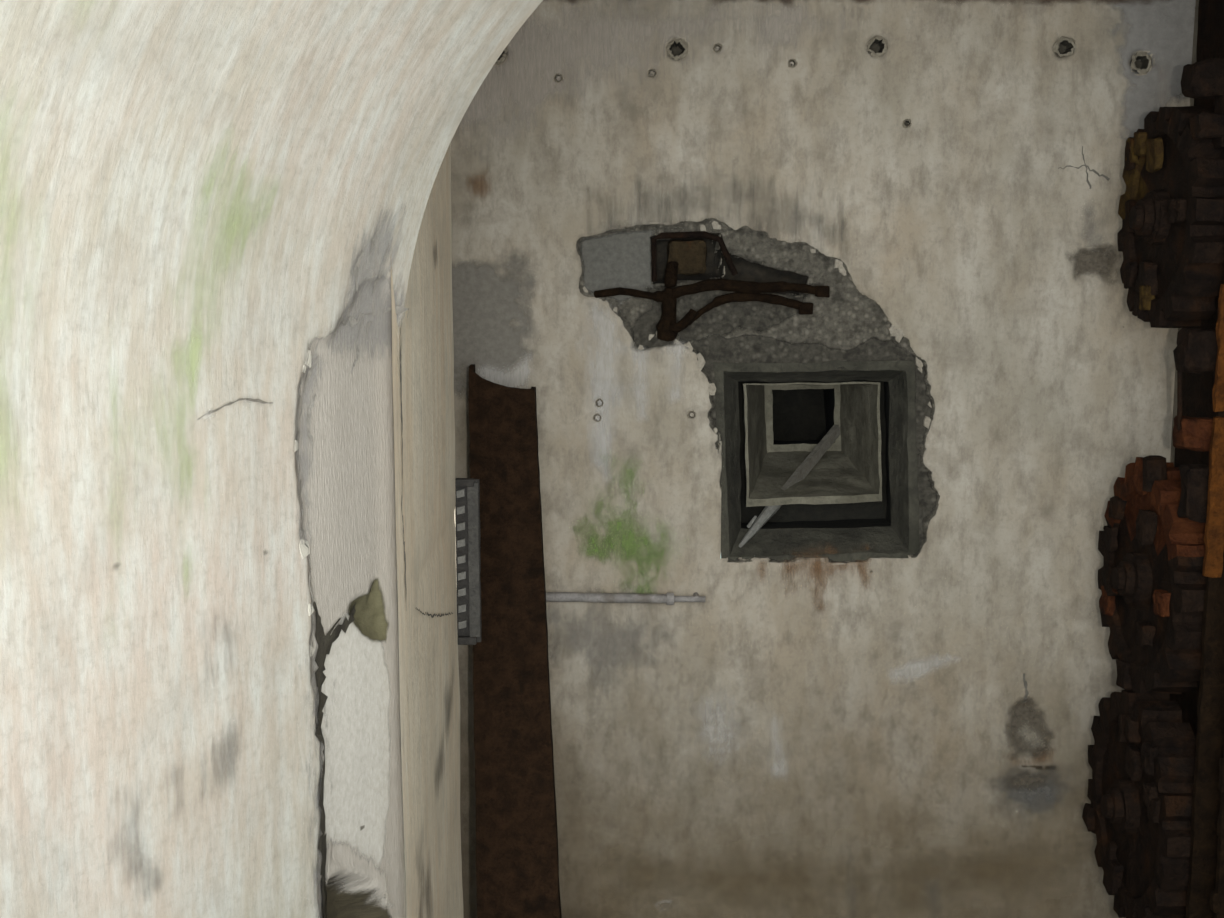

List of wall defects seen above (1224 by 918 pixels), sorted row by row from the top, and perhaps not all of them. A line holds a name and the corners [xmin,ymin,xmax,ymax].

crack [198,398,273,420]
flaking render [294,217,409,918]
spalling [576,218,940,558]
crack [313,601,356,918]